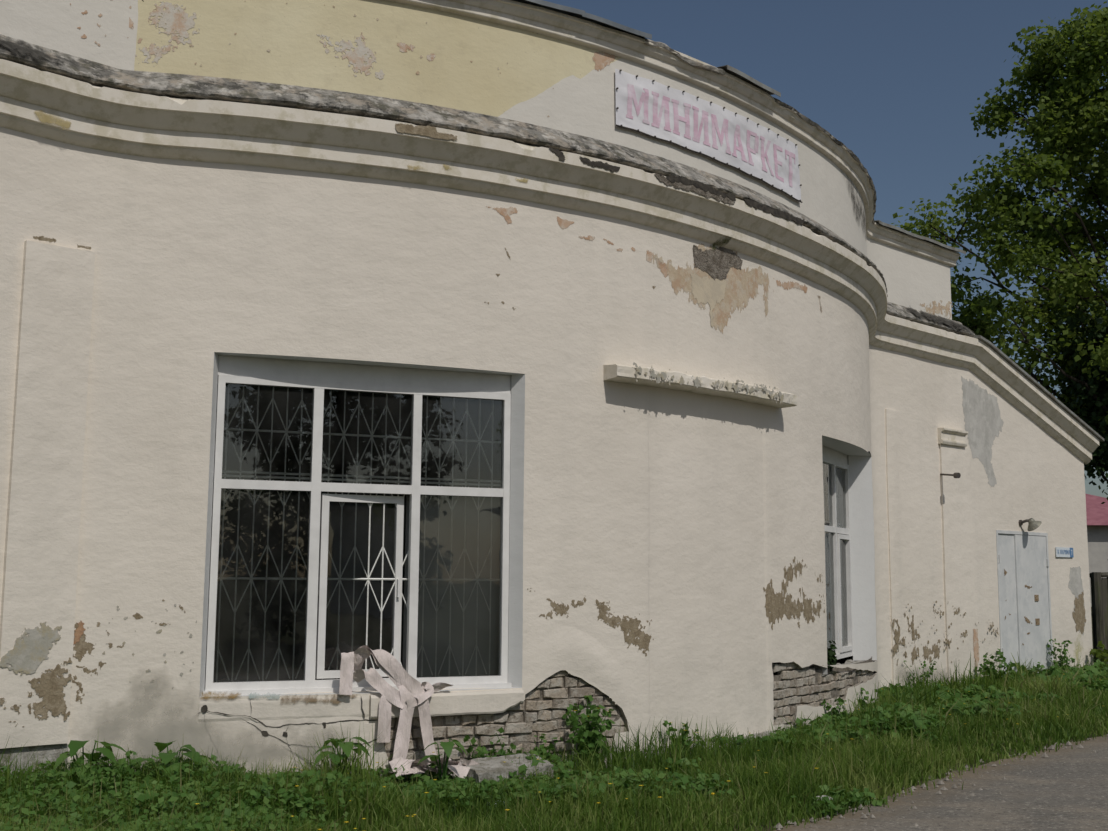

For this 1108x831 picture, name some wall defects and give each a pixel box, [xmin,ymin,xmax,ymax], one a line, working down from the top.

water stain [0,39,60,64]
peeling [127,2,200,67]
flaking render [579,236,808,334]
peeling [633,362,793,403]
flaking render [0,599,183,727]
crack [198,697,377,769]
flaking render [384,670,629,763]
peeling [539,597,654,657]
peeling [763,557,825,630]
flaking render [772,657,877,725]
peeling [891,601,1011,671]
flaking render [1068,567,1086,635]